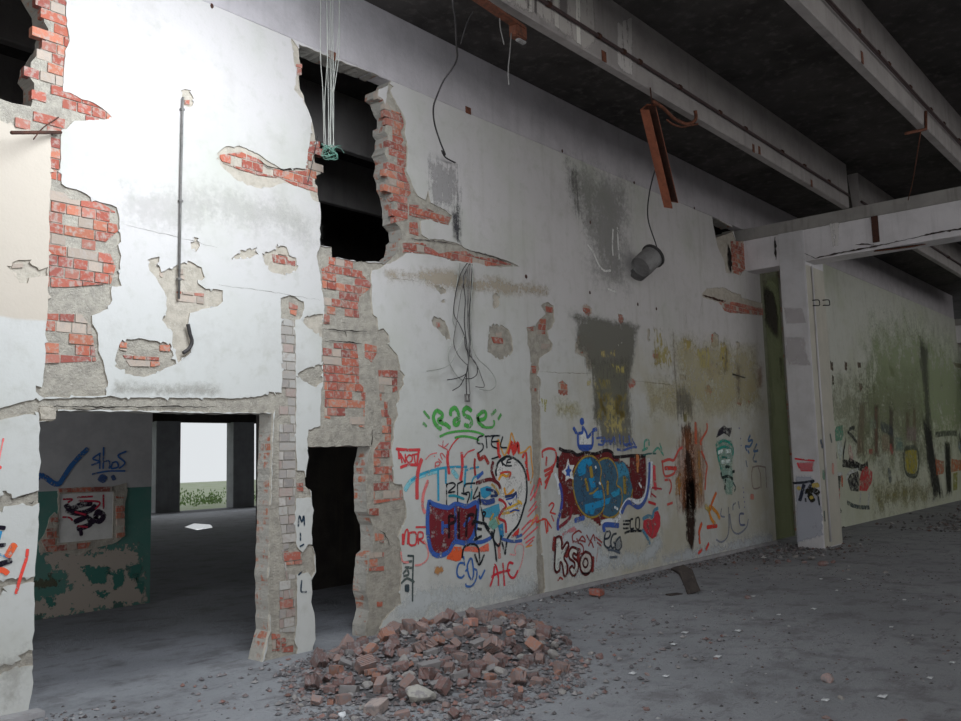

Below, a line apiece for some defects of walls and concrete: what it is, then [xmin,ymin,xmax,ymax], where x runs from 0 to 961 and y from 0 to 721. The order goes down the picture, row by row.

crack [805,228,961,259]
spalling [0,0,516,661]
spalling [702,287,763,316]
damp [574,315,637,447]
spalling [526,302,554,594]
damp [923,419,952,497]
spalling [0,650,33,675]